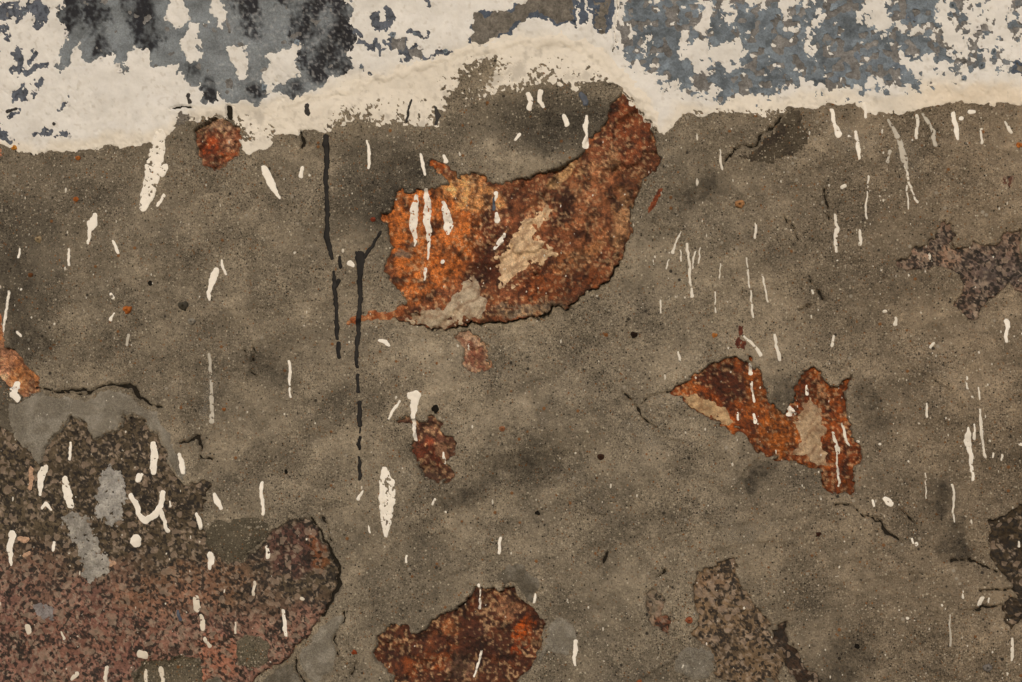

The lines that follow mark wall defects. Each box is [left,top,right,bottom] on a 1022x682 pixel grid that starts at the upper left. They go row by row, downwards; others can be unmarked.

peeling [468,0,1022,107]
flaking render [896,221,1022,320]
crack [36,383,162,408]
flaking render [0,414,339,682]
flaking render [691,557,821,682]
flaking render [987,504,1022,629]